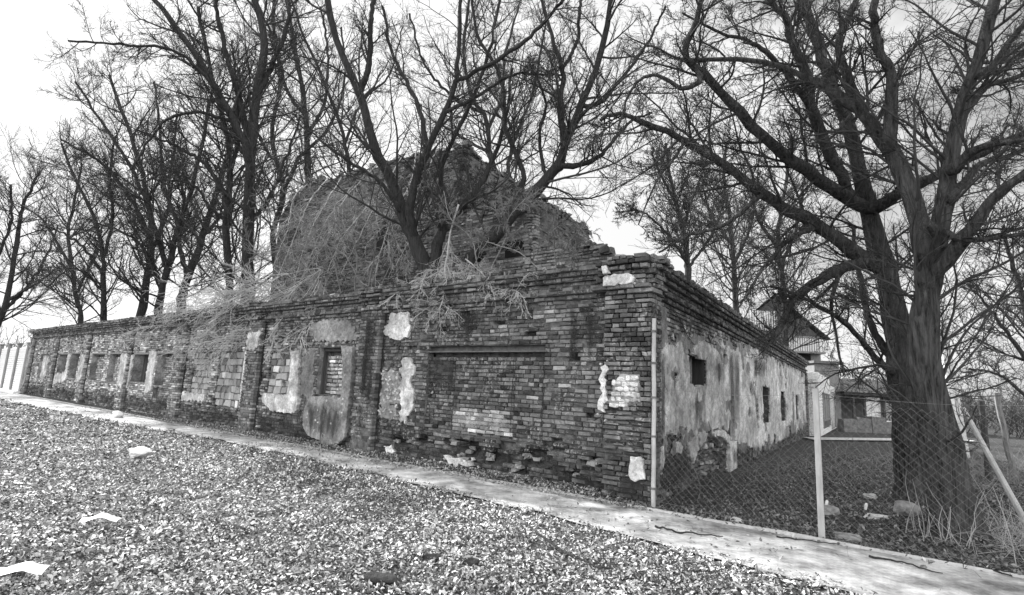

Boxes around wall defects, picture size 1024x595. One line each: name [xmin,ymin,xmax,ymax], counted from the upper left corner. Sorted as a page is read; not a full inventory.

peeling [300,316,360,401]
spalling [376,357,417,425]
peeling [599,360,642,408]
peeling [660,305,807,476]
peeling [443,439,495,469]
spalling [511,453,542,472]
spalling [564,459,602,477]